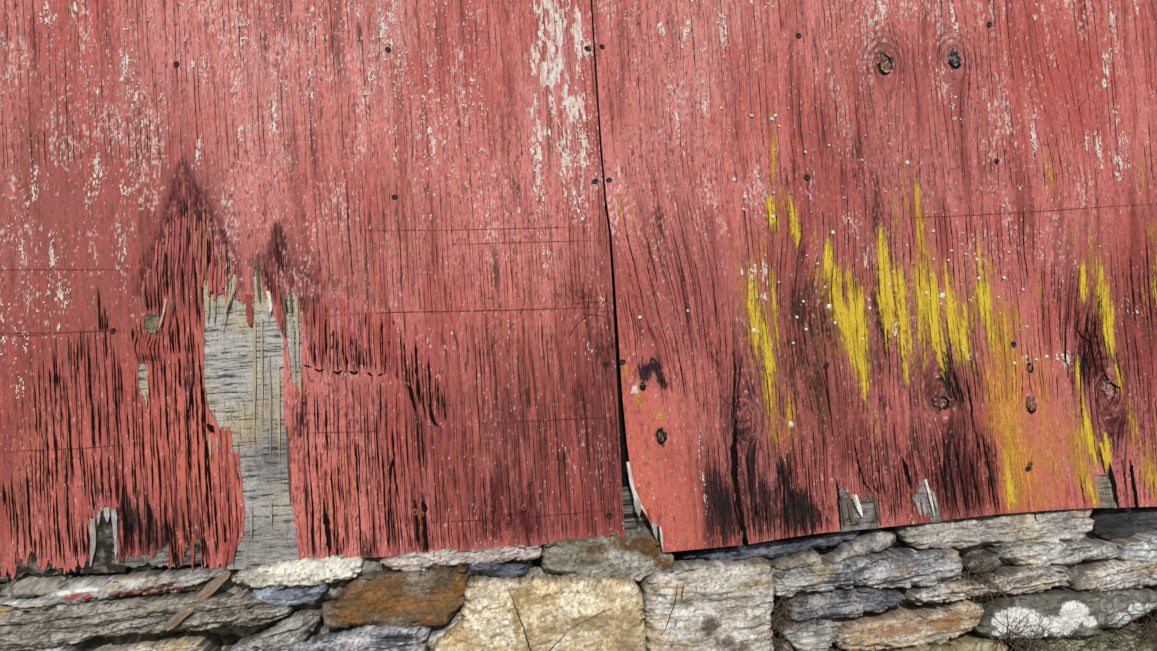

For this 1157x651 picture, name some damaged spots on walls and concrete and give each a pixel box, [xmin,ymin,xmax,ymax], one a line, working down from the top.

crack [0,196,241,597]
crack [5,0,428,169]
leakage [270,227,286,268]
crack [262,241,294,314]
peeling [526,0,598,268]
crack [303,0,1157,558]
leakage [705,130,1157,548]